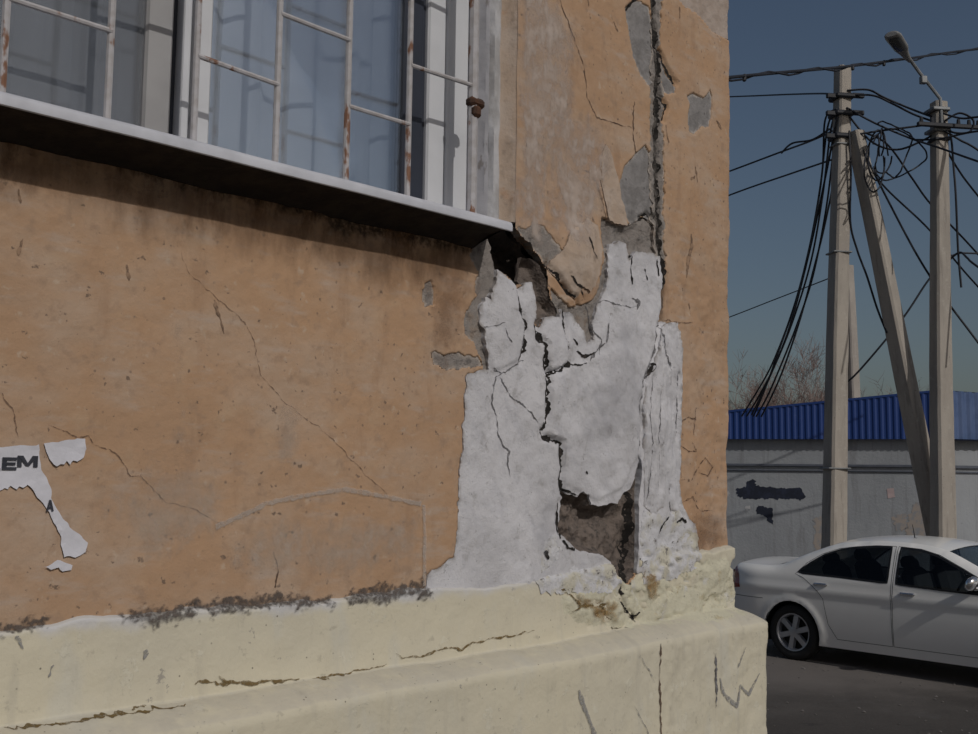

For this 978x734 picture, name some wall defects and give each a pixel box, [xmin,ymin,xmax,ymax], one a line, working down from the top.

peeling [679,0,729,40]
damp [108,174,207,224]
damp [219,203,468,276]
spalling [431,0,675,371]
crack [560,0,693,290]
spalling [687,91,722,134]
crack [484,265,641,539]
crack [561,305,692,620]
spalling [535,478,702,595]
crack [5,630,534,730]
crack [635,647,662,734]
crack [712,658,720,706]